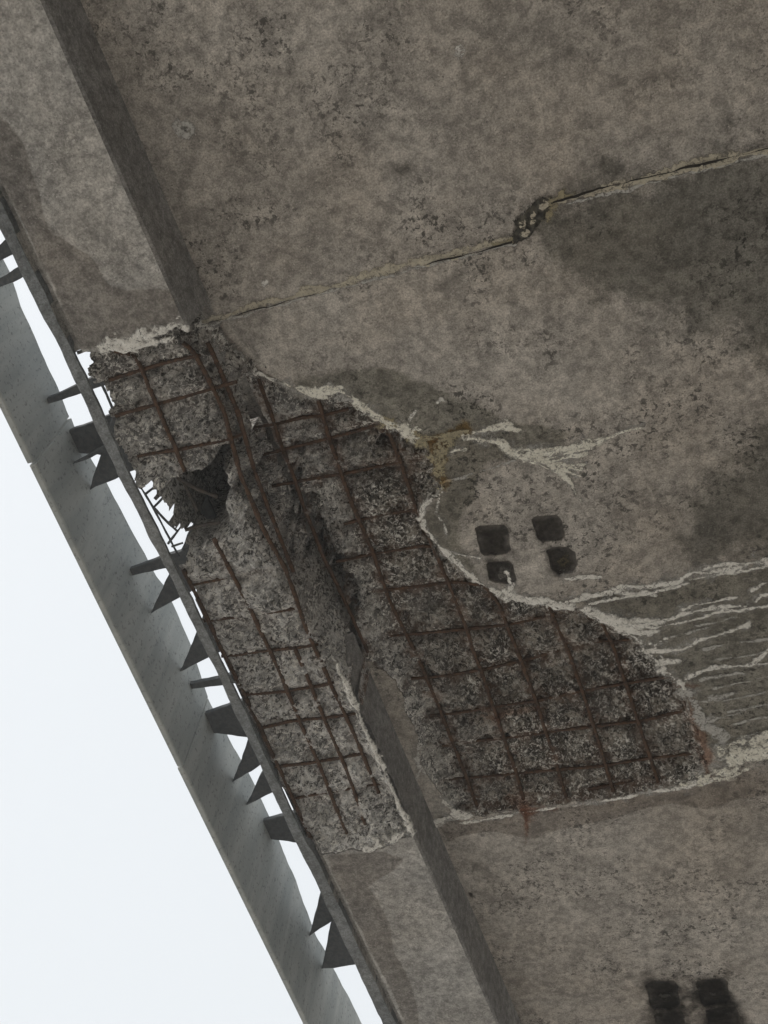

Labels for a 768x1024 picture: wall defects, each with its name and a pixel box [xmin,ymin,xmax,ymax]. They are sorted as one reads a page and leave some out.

crack [202,241,513,325]
crack [551,148,768,204]
spalling [77,310,708,855]
leakage [97,316,768,807]